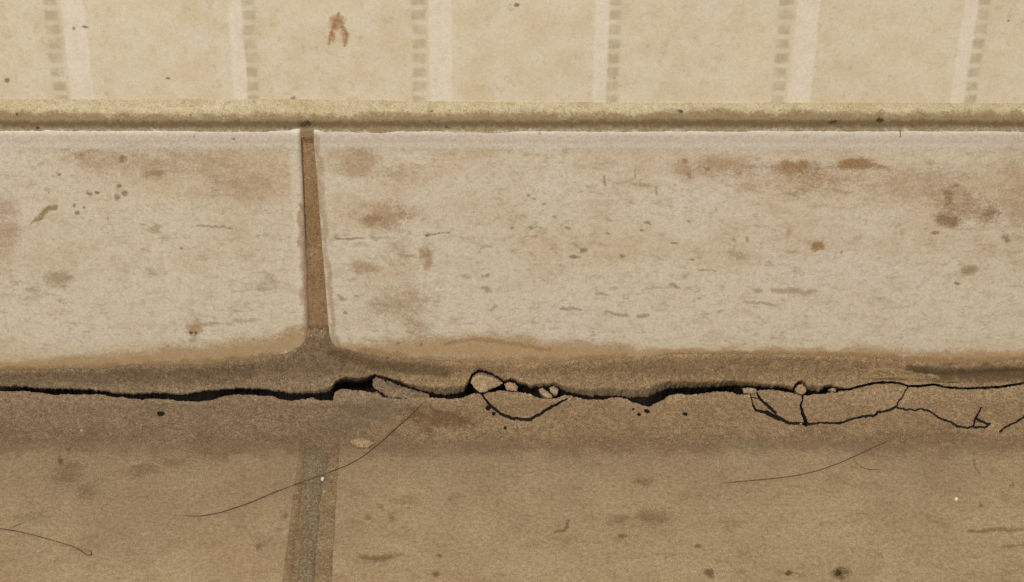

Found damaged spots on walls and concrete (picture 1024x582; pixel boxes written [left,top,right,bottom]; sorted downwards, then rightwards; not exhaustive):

water stain [0,326,307,371]
water stain [335,330,666,365]
water stain [685,346,1024,385]
crack [0,370,1024,433]